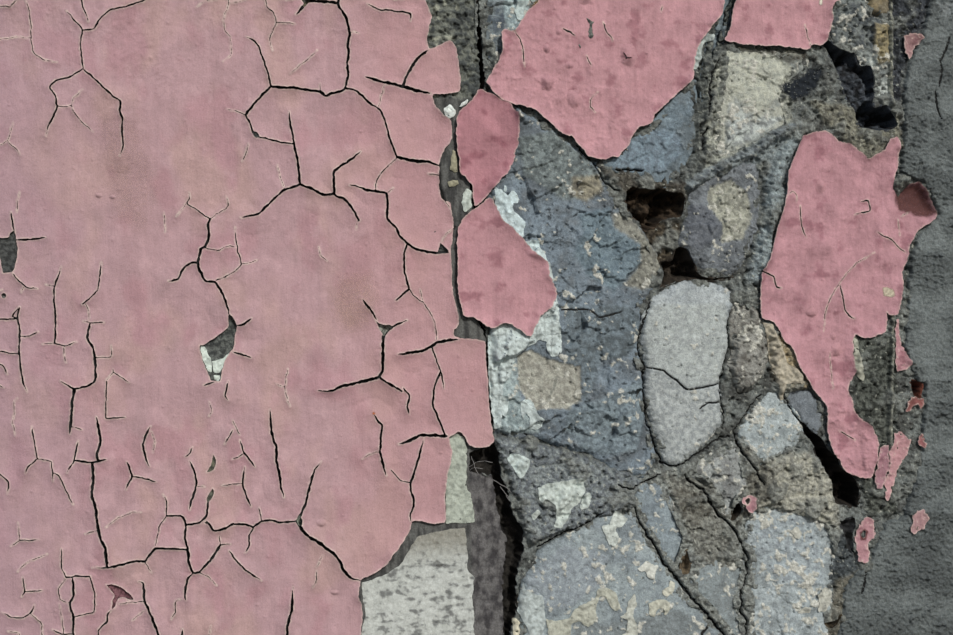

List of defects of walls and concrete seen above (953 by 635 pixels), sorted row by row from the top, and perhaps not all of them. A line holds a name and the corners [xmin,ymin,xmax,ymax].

crack [0,0,145,153]
peeling [903,33,925,59]
peeling [0,231,18,273]
crack [11,202,45,241]
peeling [200,314,238,381]
crack [164,0,458,521]
peeling [436,0,840,336]
peeling [759,130,937,501]
peeling [107,584,133,609]
crack [0,266,359,635]
crack [561,302,804,635]
peeling [854,517,876,563]